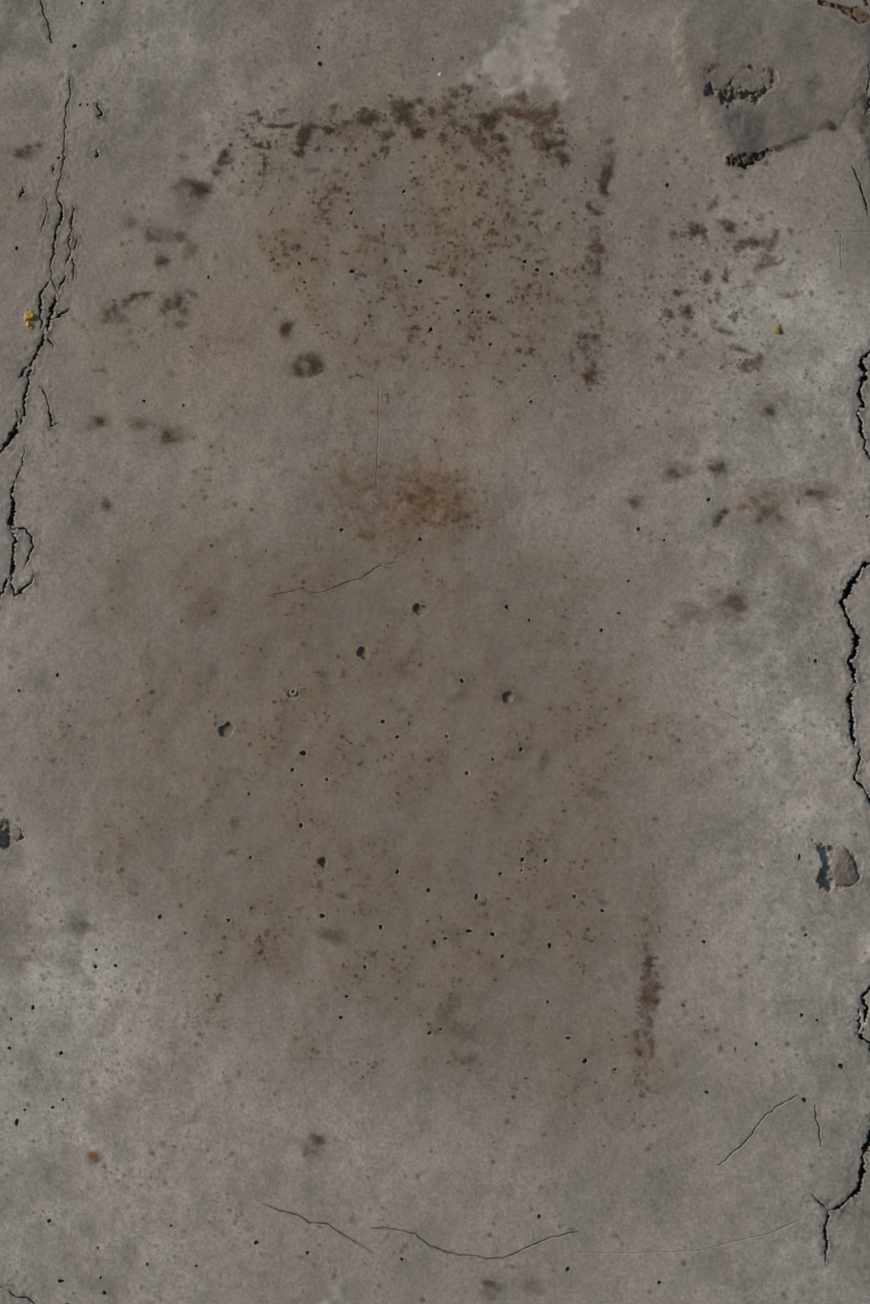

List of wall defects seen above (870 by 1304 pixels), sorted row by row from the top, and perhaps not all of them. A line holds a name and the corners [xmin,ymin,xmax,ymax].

spalling [695,60,783,111]
rust [191,143,243,195]
rust [242,82,568,225]
rust [557,166,611,224]
spalling [723,146,776,174]
crack [0,78,105,614]
crack [853,348,870,463]
crack [836,559,870,811]
spalling [0,816,27,856]
crack [854,983,870,1057]
crack [716,1093,824,1169]
crack [810,1116,870,1265]